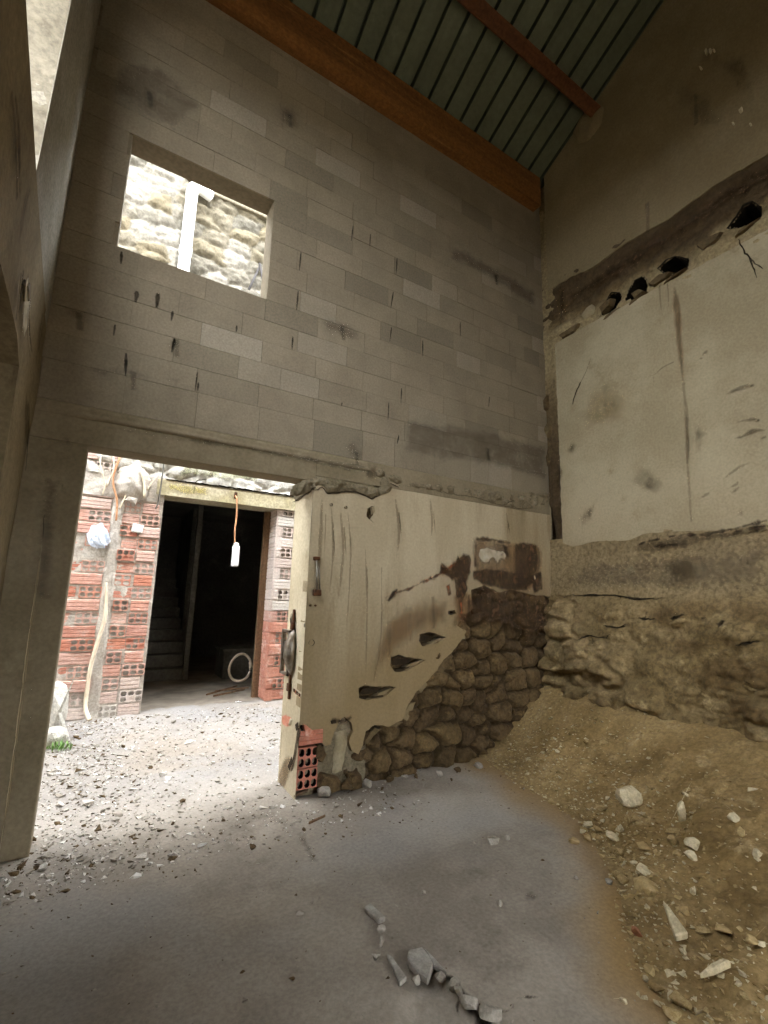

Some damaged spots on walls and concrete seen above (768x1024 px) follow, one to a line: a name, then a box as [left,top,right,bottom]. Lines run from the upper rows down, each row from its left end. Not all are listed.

spalling [539,156,768,539]
crack [738,239,763,278]
spalling [271,586,549,800]